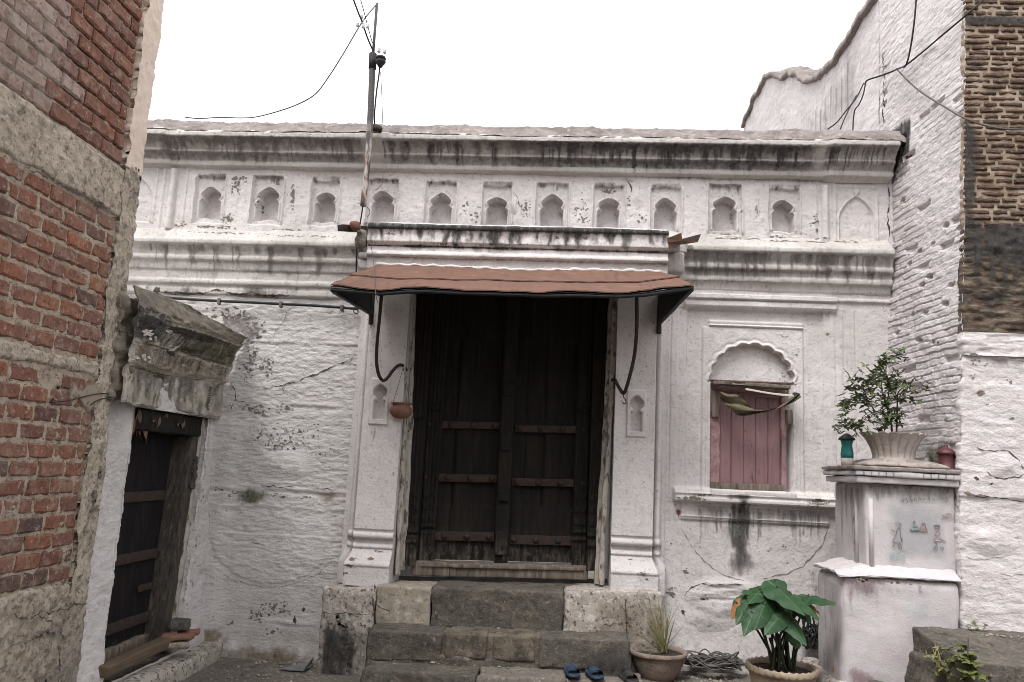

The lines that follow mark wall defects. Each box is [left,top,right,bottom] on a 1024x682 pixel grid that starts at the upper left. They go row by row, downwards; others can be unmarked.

damp [383,140,812,189]
damp [825,142,904,167]
damp [352,222,669,265]
peeling [153,287,274,382]
crack [131,318,355,410]
peeling [229,403,339,455]
crack [955,447,1024,529]
damp [729,494,761,571]
crack [681,528,828,598]